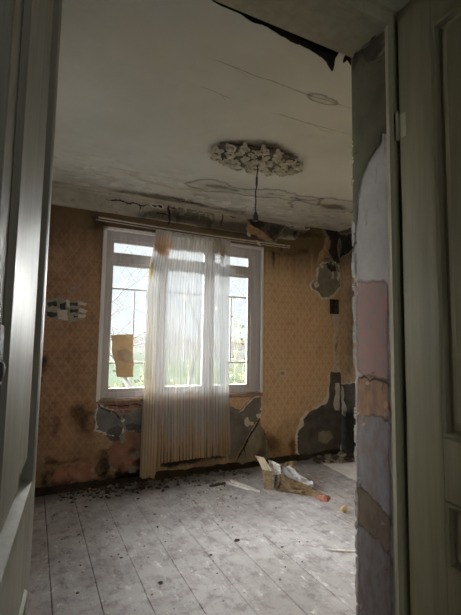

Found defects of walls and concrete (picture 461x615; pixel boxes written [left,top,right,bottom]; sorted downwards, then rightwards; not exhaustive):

crack [108,199,147,209]
leakage [119,191,212,209]
leakage [145,211,248,234]
peeling [57,300,70,320]
peeling [269,30,392,615]
spalling [94,391,263,474]